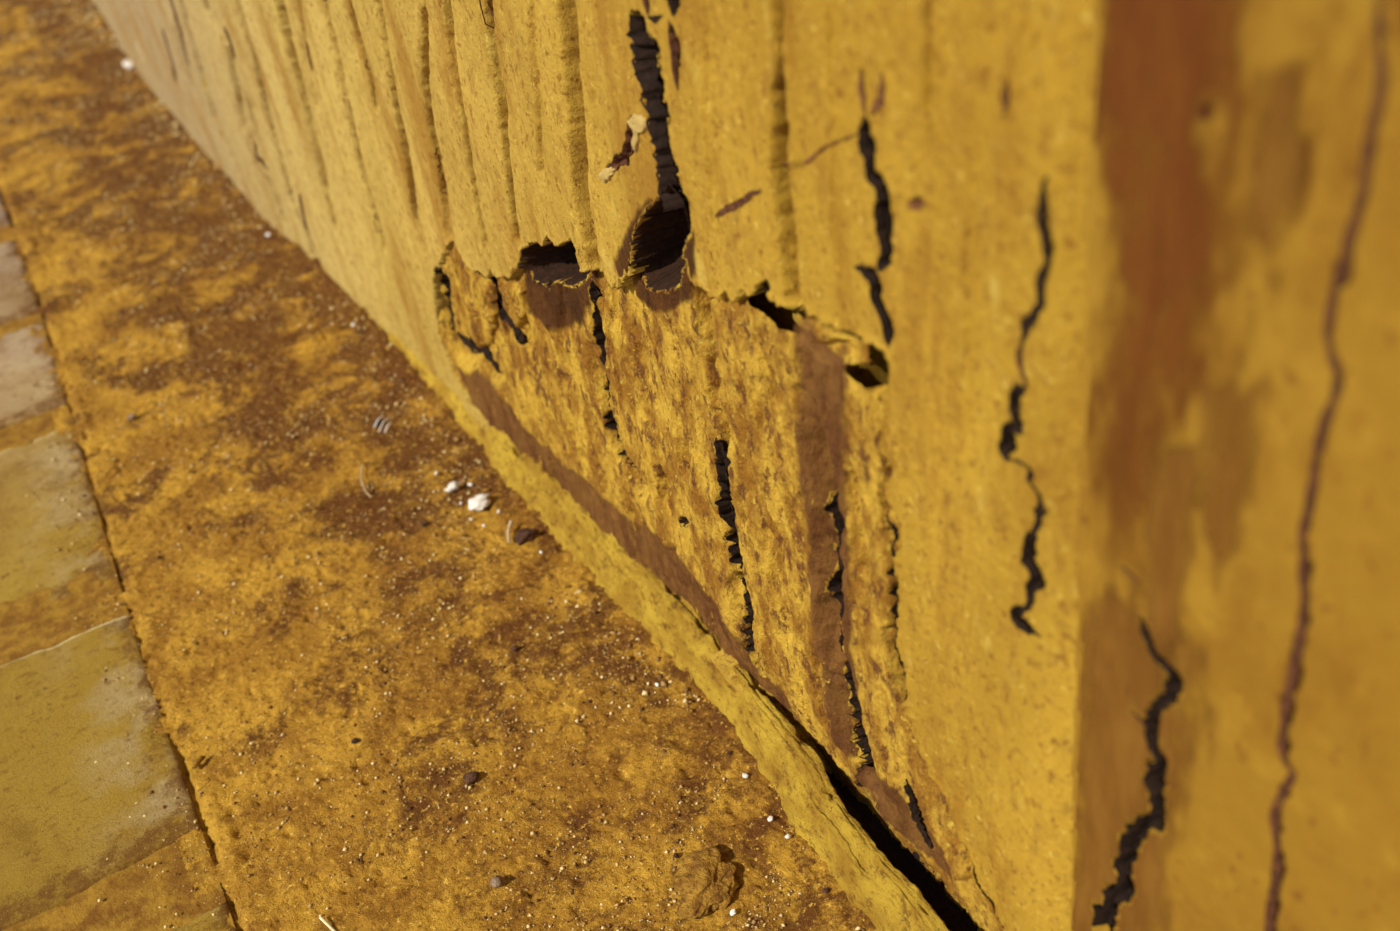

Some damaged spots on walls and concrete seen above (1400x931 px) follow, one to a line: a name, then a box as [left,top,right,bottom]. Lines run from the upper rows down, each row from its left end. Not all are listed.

crack [598,0,895,347]
spalling [438,182,1003,931]
crack [824,493,1004,931]
crack [997,175,1050,637]
crack [1092,564,1184,931]
crack [1264,0,1387,931]